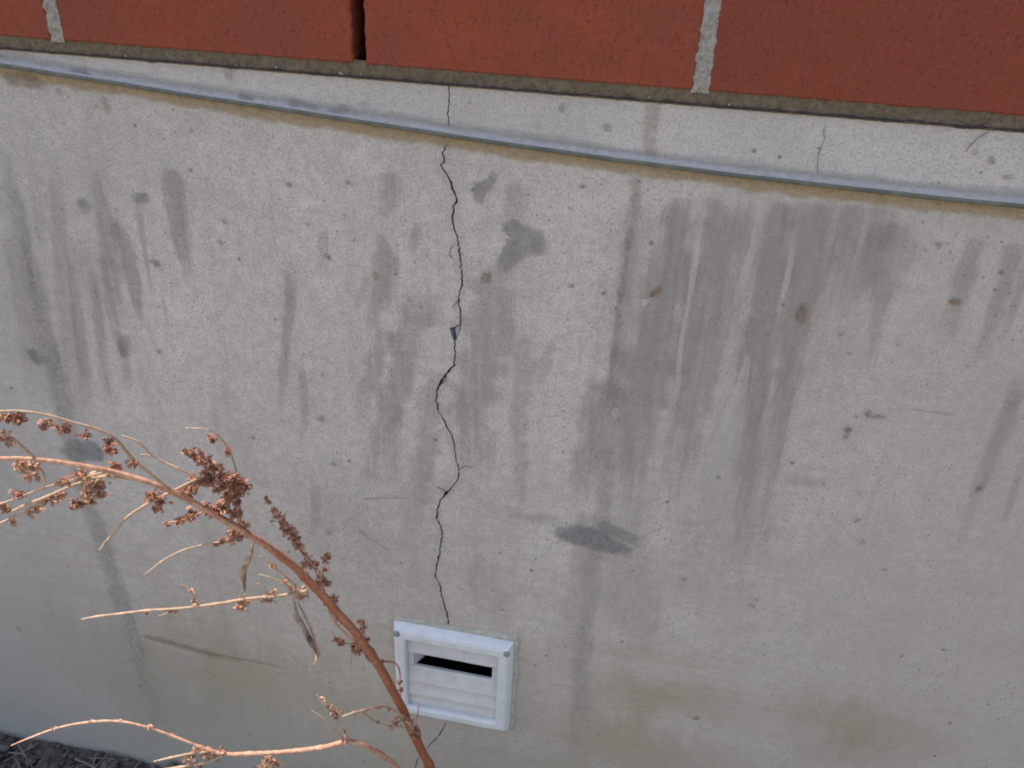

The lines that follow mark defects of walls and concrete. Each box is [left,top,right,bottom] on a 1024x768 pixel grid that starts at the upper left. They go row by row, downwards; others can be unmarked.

crack [434,86,472,624]